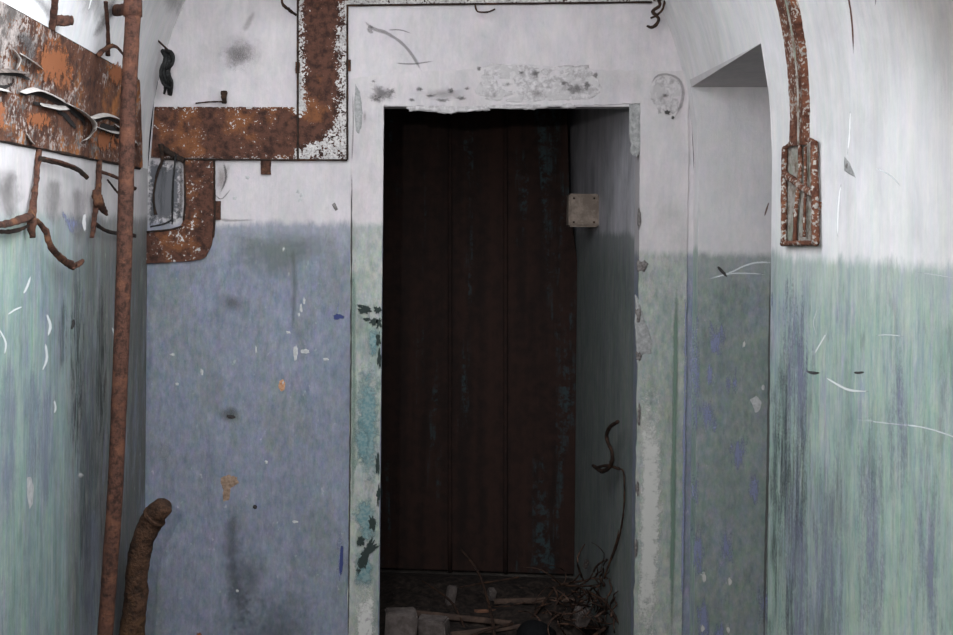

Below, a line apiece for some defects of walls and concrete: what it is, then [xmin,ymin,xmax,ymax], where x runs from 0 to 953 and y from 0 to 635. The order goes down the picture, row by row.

rust [36,37,74,94]
spalling [406,63,602,114]
rust [27,112,51,131]
peeling [352,285,378,481]
peeling [354,501,376,540]